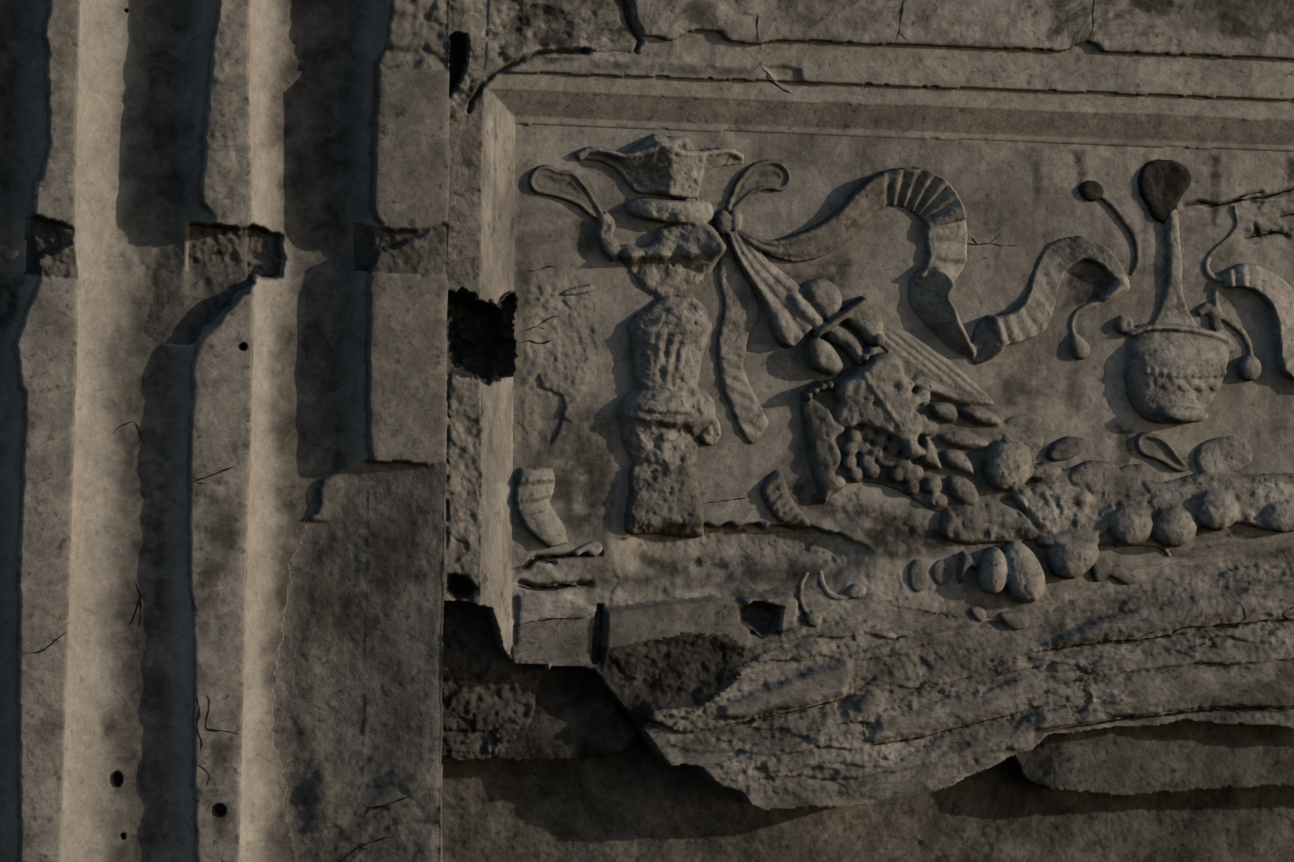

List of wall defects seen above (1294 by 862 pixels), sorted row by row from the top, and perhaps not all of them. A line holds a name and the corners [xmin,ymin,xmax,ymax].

spalling [448,33,467,96]
spalling [446,277,602,451]
spalling [442,530,1294,810]